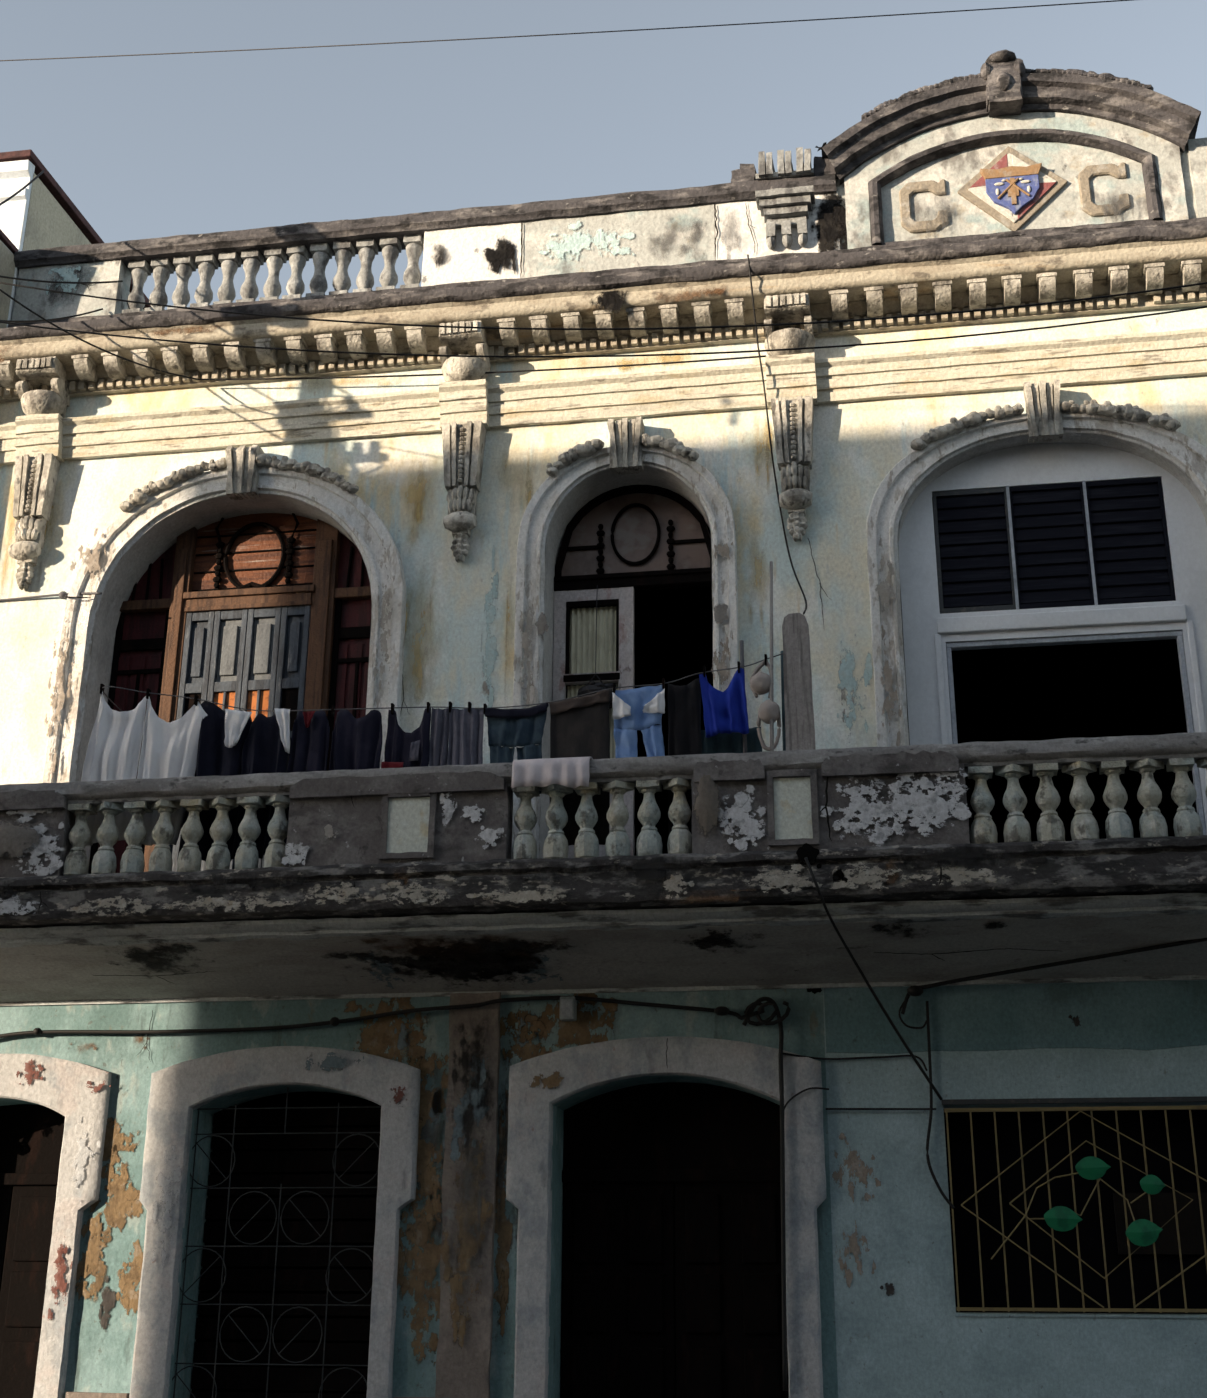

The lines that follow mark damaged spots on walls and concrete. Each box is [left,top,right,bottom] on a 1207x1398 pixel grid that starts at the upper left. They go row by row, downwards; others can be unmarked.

water stain [483,238,516,274]
peeling [539,221,634,261]
peeling [6,809,64,876]
peeling [718,784,766,852]
flaking render [742,843,998,894]
peeling [820,768,972,846]
flaking render [0,895,42,915]
water stain [110,938,201,977]
water stain [324,938,572,985]
peeling [306,993,618,1365]
peeling [48,1116,182,1332]
peeling [836,1220,895,1295]